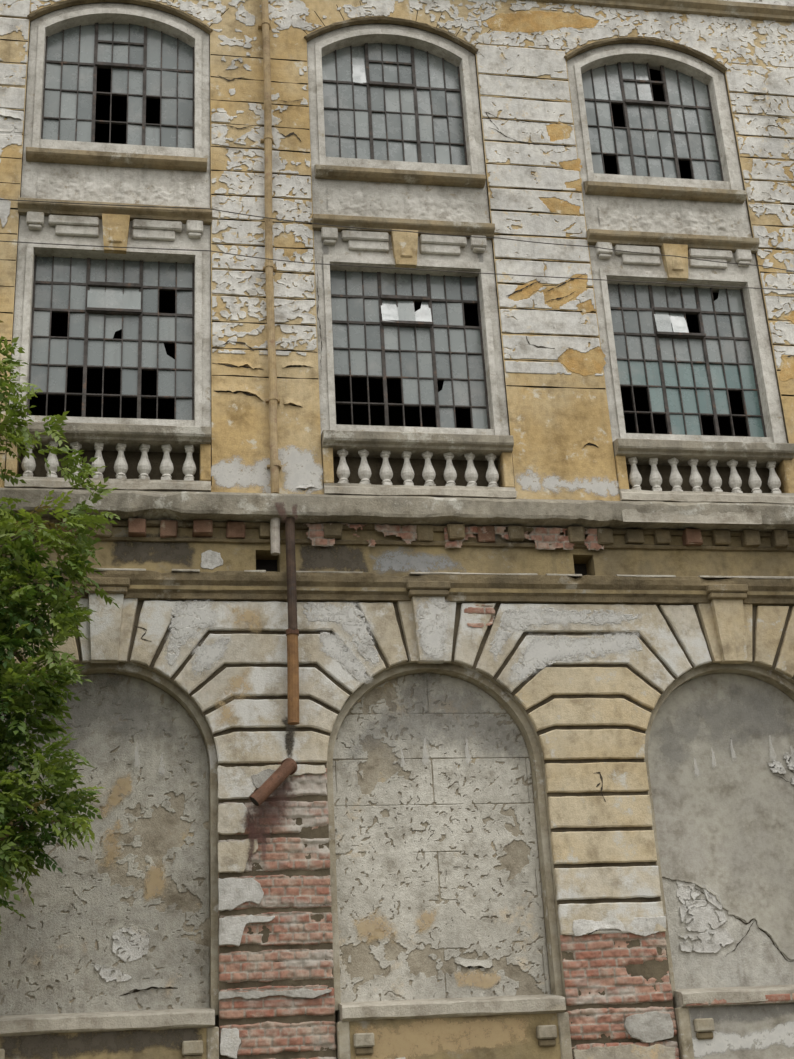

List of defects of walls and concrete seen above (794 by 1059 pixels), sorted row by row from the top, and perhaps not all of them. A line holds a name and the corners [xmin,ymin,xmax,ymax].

peeling [0,0,61,163]
peeling [0,198,11,228]
peeling [156,0,794,381]
flaking render [304,523,417,547]
flaking render [444,526,509,549]
flaking render [524,527,604,551]
flaking render [622,509,762,524]
peeling [464,604,642,682]
peeling [768,752,794,785]
peeling [0,599,551,1059]
crack [695,888,793,962]
flaking render [559,880,794,1059]